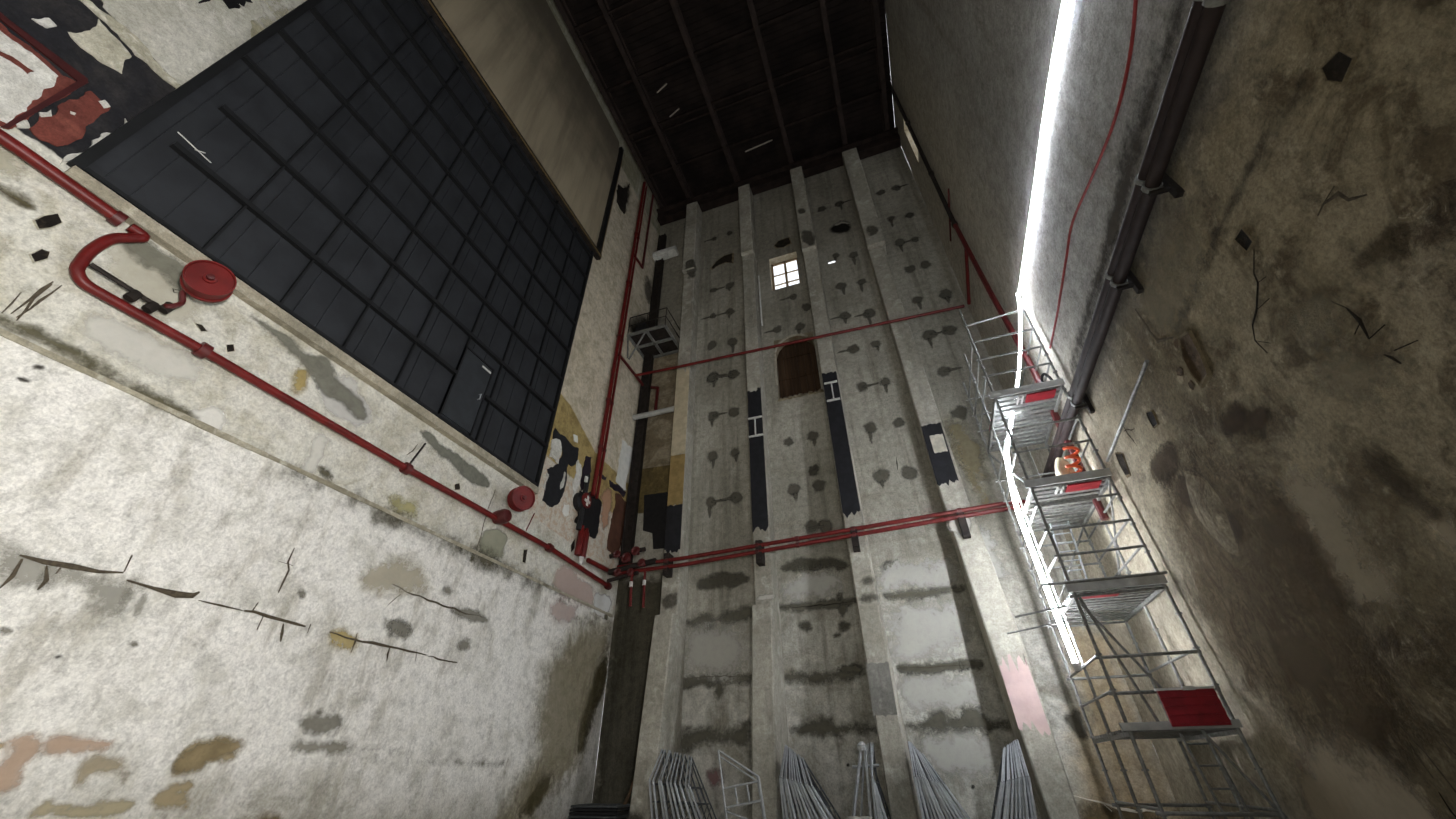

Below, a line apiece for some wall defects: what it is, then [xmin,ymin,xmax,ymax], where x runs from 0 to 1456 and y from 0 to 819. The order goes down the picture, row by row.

peeling [0,18,132,164]
crack [0,548,457,663]
crack [387,584,482,620]
leakage [662,593,677,609]
leakage [680,557,1011,789]
peeling [0,735,123,792]
peeling [30,799,135,818]
peeling [153,736,236,809]